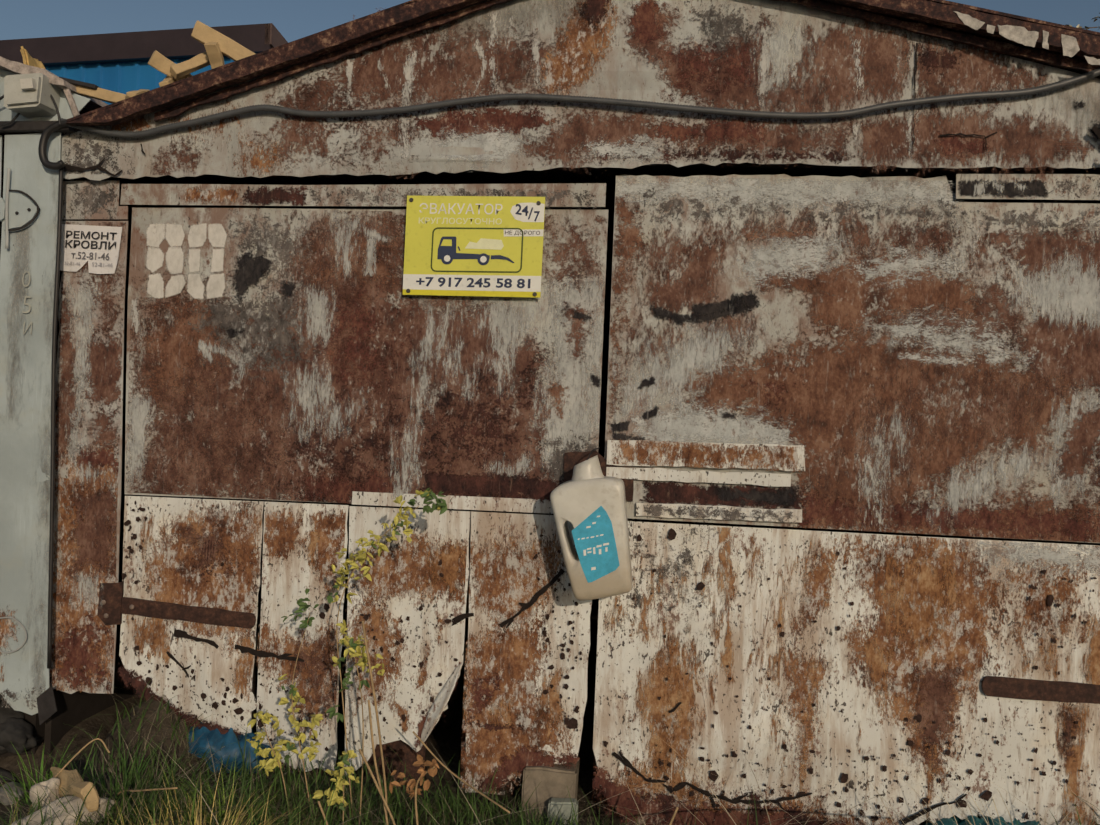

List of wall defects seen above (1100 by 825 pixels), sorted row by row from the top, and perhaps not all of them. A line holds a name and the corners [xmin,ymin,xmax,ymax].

peeling [954,11,1100,65]
corrosion [150,0,1100,176]
corrosion [49,185,580,795]
corrosion [542,195,1100,825]
peeling [359,605,428,668]
peeling [134,645,244,721]
peeling [257,703,329,763]
peeling [355,672,442,731]